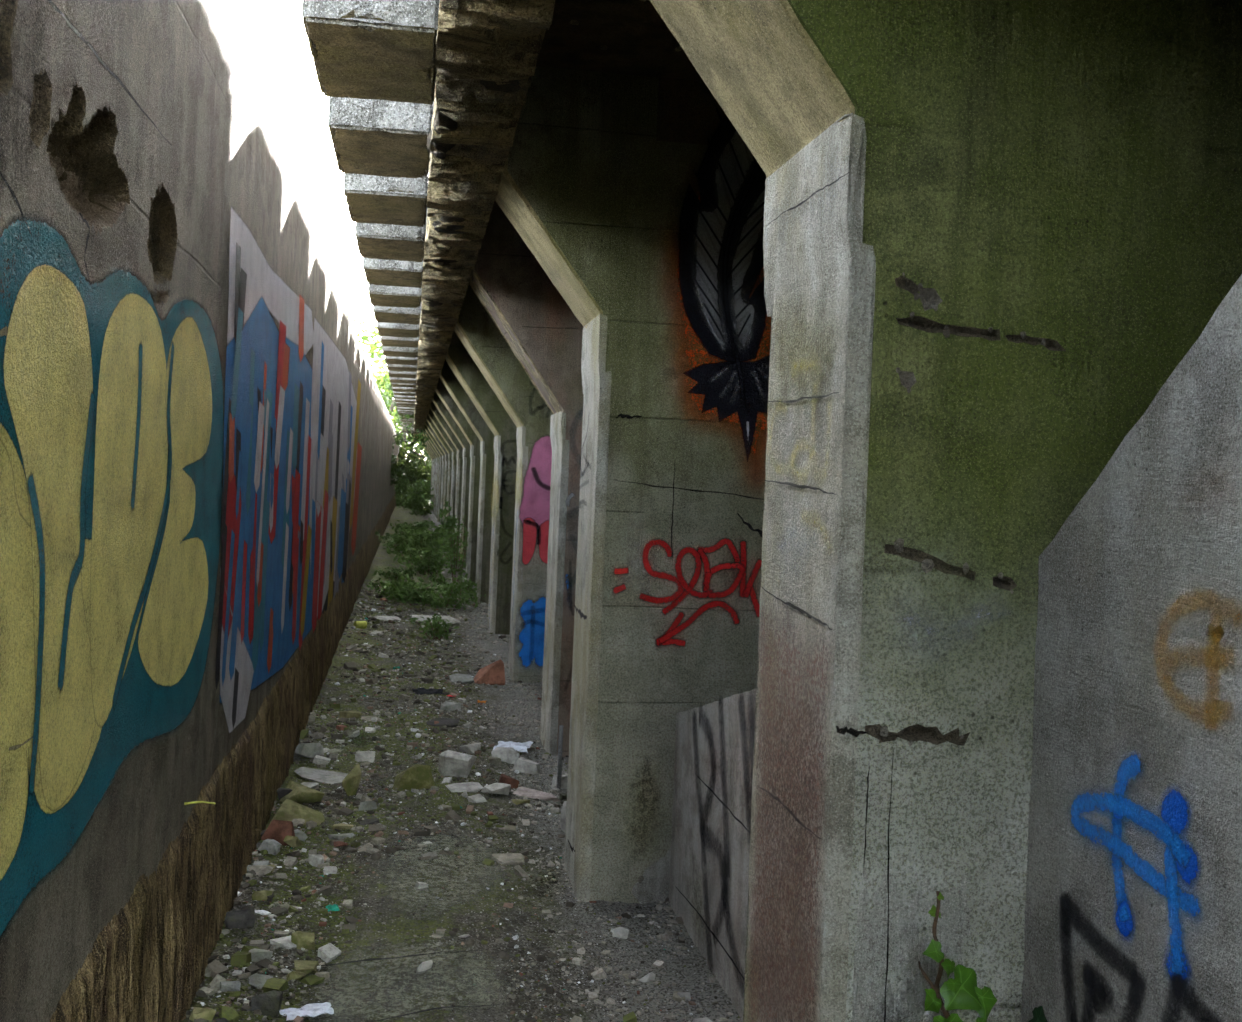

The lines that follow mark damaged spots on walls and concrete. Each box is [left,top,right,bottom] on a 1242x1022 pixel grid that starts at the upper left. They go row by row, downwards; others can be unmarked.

peeling [0,0,18,96]
spalling [27,62,130,244]
spalling [426,108,464,159]
crack [767,173,848,226]
peeling [147,179,180,306]
spalling [432,216,467,238]
spalling [895,272,1066,351]
crack [616,465,837,557]
spalling [884,538,976,581]
spalling [993,572,1017,594]
spalling [836,724,970,746]